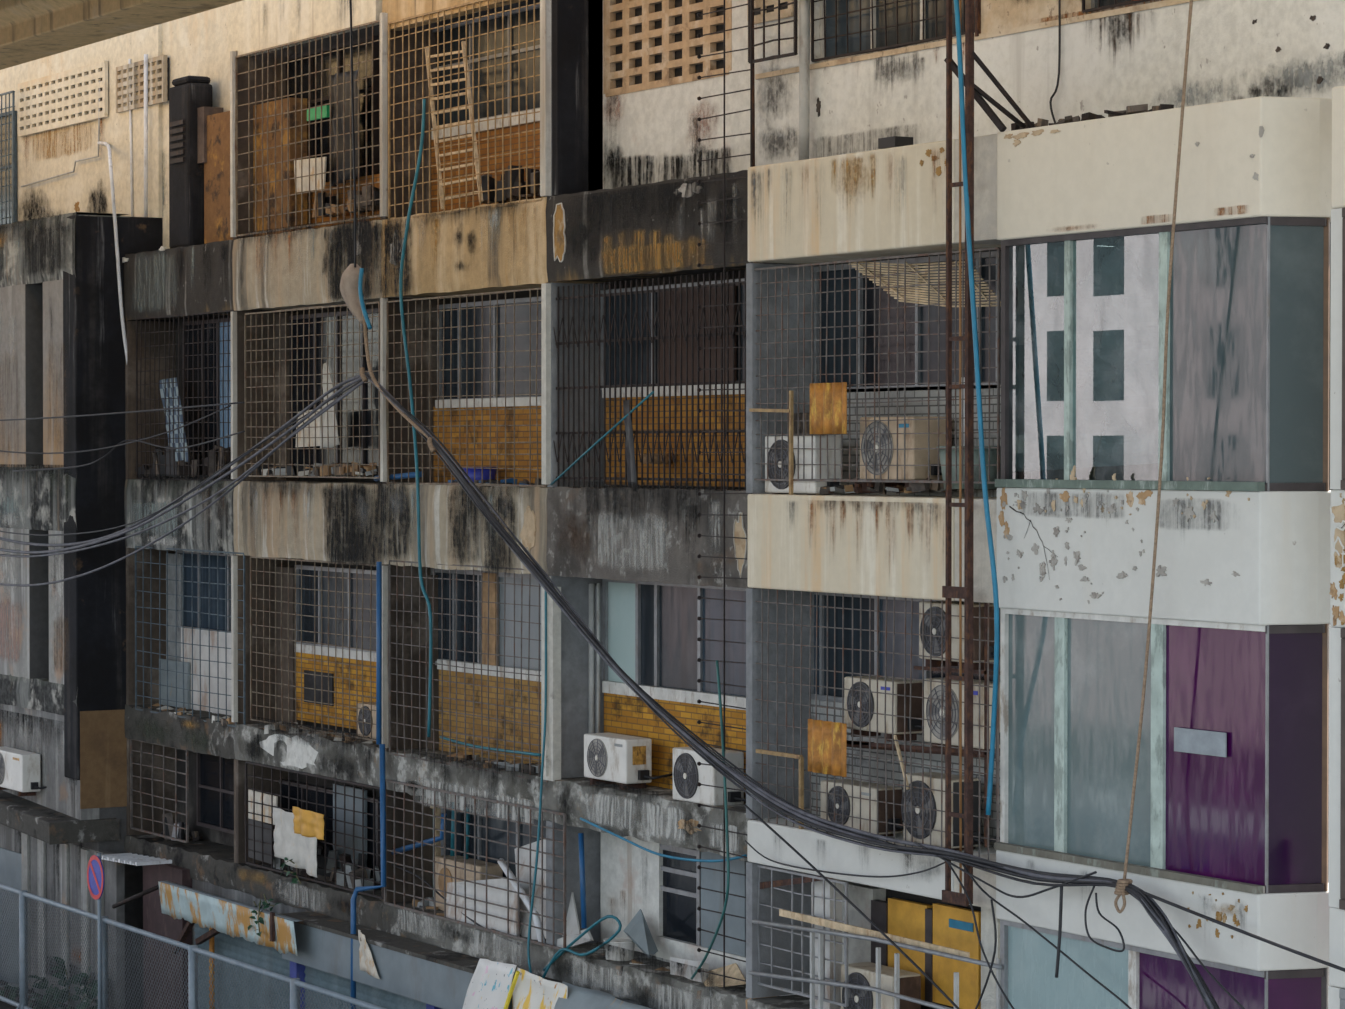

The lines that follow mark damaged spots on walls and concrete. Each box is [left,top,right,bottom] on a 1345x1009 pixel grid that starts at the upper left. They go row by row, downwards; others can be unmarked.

water stain [767,69,785,113]
water stain [1240,56,1345,99]
water stain [572,110,735,260]
water stain [752,130,795,207]
rust [833,156,875,191]
water stain [240,217,411,300]
water stain [242,480,413,566]
water stain [450,486,515,573]
rust [789,500,890,535]
peeling [998,465,1153,604]
peeling [1329,493,1345,626]
spalling [260,734,318,769]